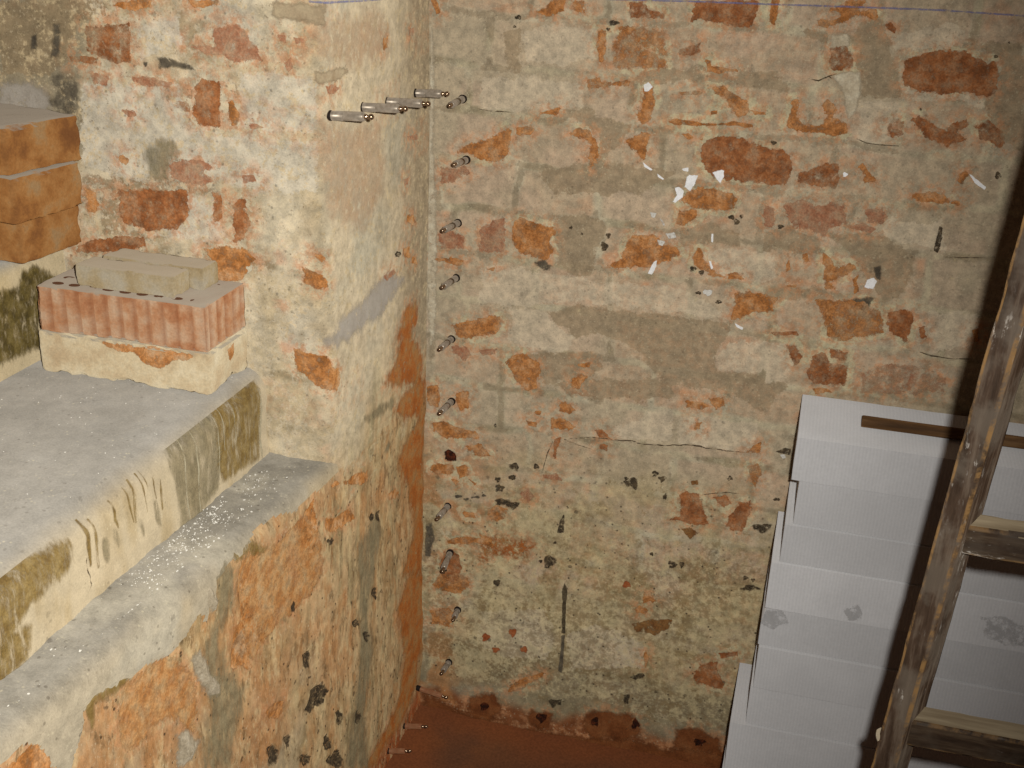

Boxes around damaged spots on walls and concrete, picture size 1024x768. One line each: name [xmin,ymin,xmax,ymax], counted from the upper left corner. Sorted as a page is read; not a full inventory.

flaking render [902,49,999,97]
flaking render [179,78,263,129]
flaking render [457,125,534,162]
flaking render [669,43,848,226]
flaking render [76,159,256,281]
flaking render [477,217,556,260]
flaking render [293,348,340,391]
damp [166,382,263,525]
crack [543,437,738,468]
flaking render [652,471,771,539]
flaking render [231,499,355,670]
spalling [305,681,329,713]